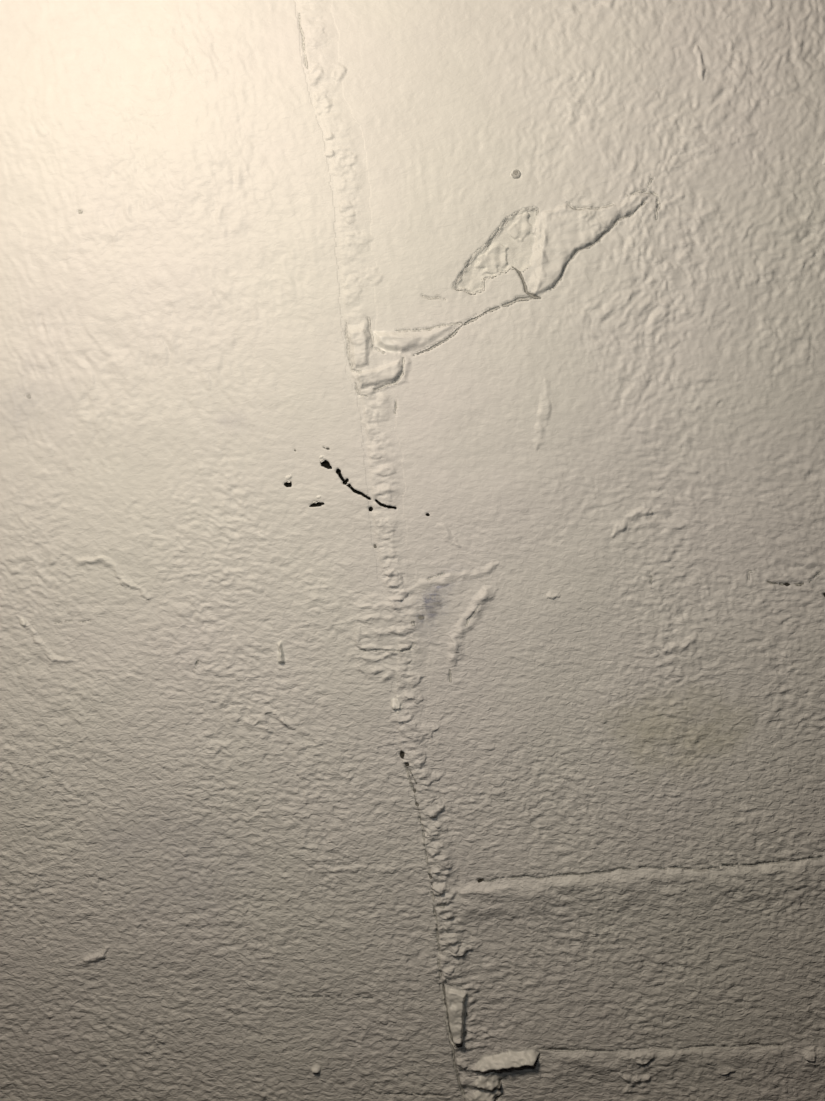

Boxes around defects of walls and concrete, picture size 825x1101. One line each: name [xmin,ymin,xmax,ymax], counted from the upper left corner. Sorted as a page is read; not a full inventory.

crack [294,0,825,1101]
peeling [452,126,761,299]